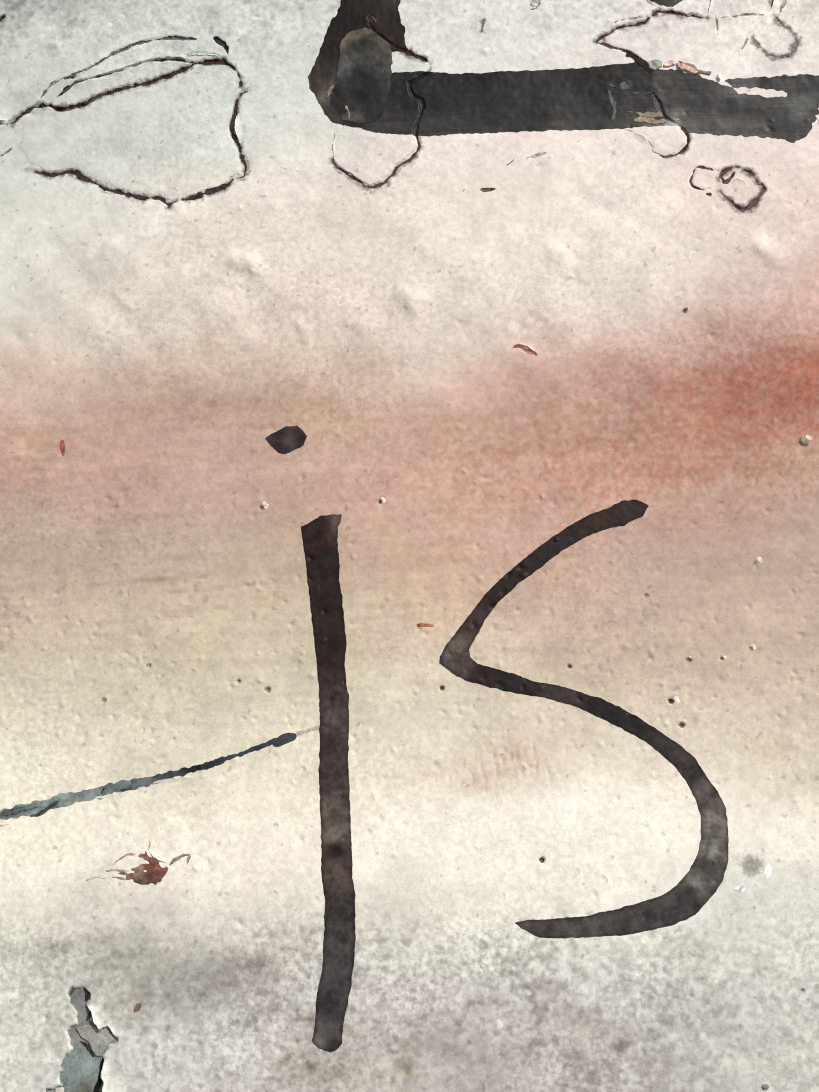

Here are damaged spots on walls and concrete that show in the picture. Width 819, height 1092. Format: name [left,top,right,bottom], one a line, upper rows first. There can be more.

crack [593,0,801,61]
crack [0,35,248,209]
crack [331,127,421,189]
crack [630,129,767,213]
peeling [46,987,125,1092]